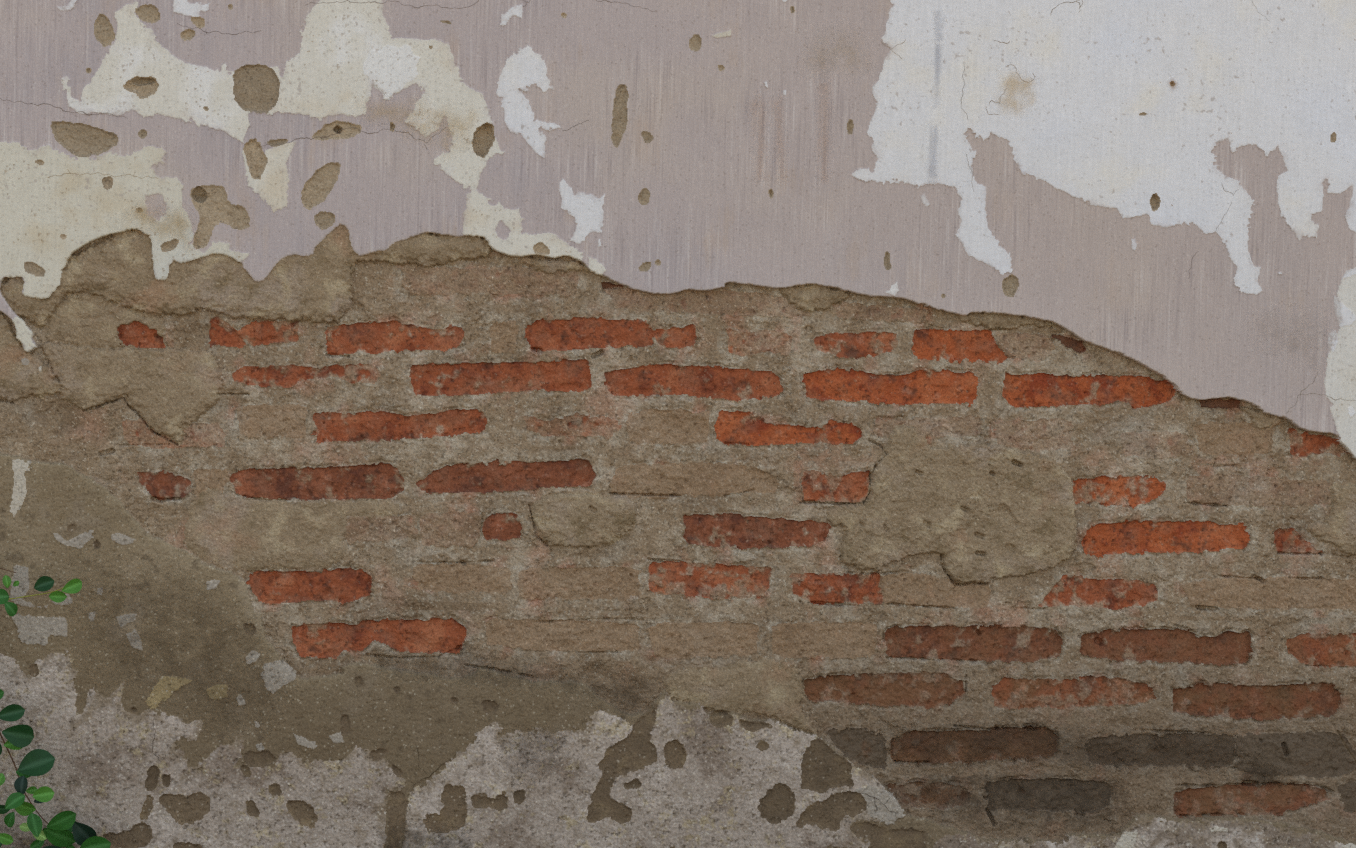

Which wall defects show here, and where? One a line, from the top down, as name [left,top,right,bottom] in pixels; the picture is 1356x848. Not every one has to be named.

peeling [0,121,250,299]
peeling [61,0,584,262]
peeling [559,178,605,244]
spalling [638,188,650,205]
peeling [847,0,1356,297]
spalling [0,225,1356,848]